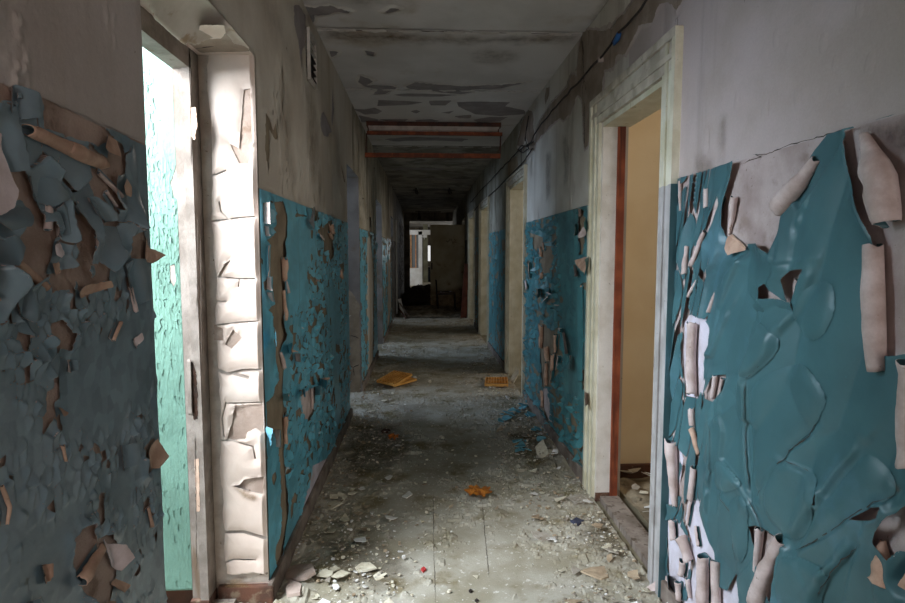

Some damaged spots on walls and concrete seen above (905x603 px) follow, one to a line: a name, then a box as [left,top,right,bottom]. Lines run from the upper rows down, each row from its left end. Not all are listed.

peeling [0,83,132,322]
peeling [125,232,165,313]
peeling [121,439,169,472]
peeling [214,325,242,348]
peeling [231,89,252,164]
peeling [228,201,307,564]
peeling [355,0,684,175]
peeling [538,209,589,422]
peeling [647,293,784,603]
peeling [681,137,825,298]
peeling [851,115,905,469]
peeling [862,510,905,589]